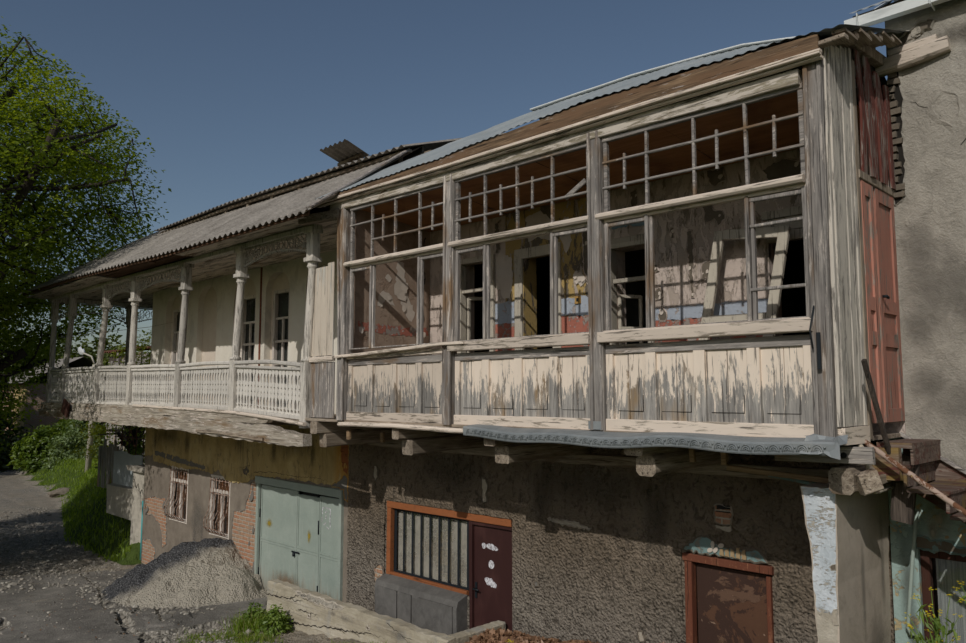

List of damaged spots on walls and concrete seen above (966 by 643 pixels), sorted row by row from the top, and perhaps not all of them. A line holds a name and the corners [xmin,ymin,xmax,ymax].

peeling [706,167,726,187]
peeling [761,158,801,181]
peeling [494,222,513,300]
peeling [525,210,588,287]
peeling [685,229,710,298]
peeling [702,205,725,227]
spalling [231,466,256,572]
peeling [801,486,839,643]